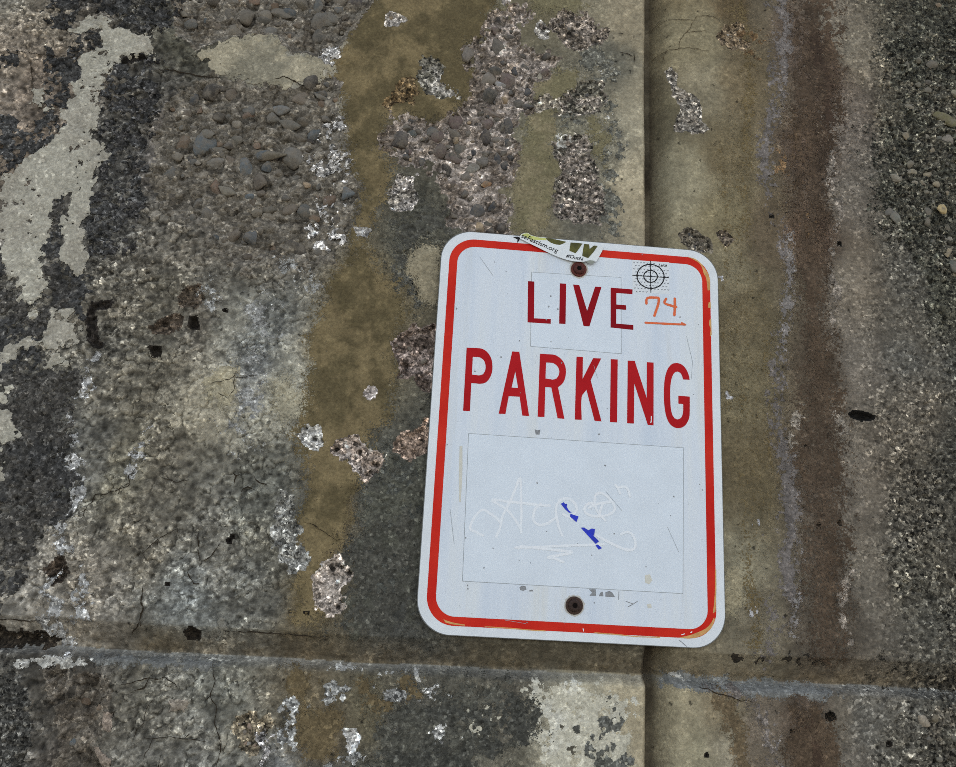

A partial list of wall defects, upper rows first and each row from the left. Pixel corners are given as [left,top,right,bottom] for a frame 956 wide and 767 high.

spalling [377,0,610,235]
peeling [0,14,156,372]
leakage [819,149,845,337]
leakage [712,0,808,674]
peeling [0,384,22,481]
peeling [46,459,84,526]
spalling [297,417,429,484]
leakage [831,406,850,436]
spalling [270,489,354,618]
leakage [837,566,855,646]
peeling [467,705,501,737]